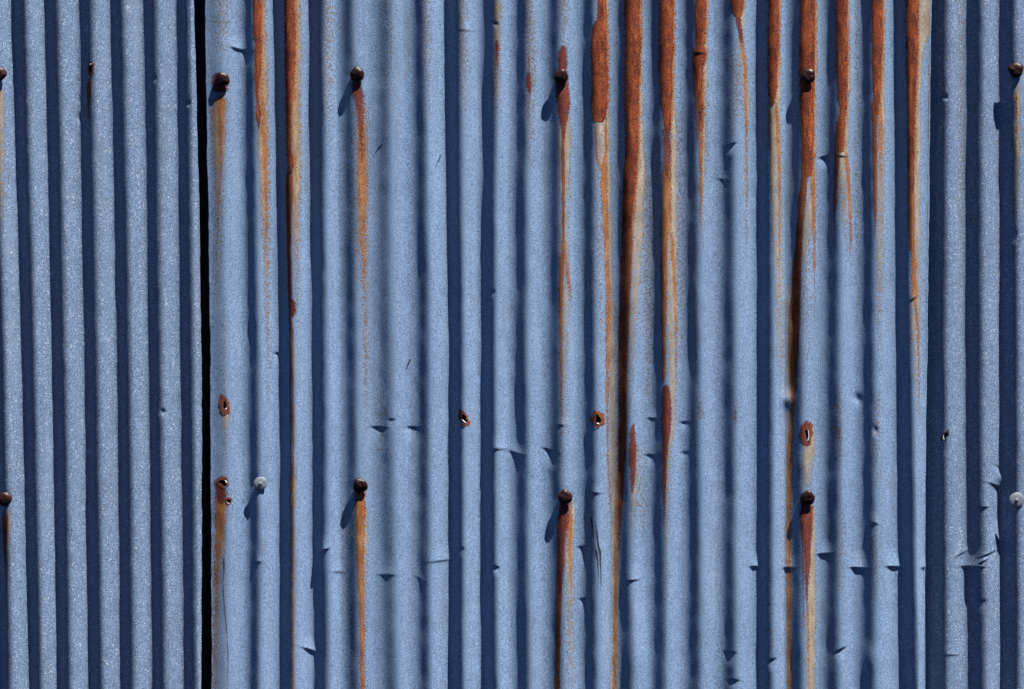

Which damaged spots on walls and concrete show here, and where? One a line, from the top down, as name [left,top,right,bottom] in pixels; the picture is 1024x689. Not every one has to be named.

rust [252,0,272,368]
rust [283,0,303,689]
rust [554,45,573,452]
rust [590,0,646,689]
rust [657,0,679,686]
rust [692,0,710,256]
rust [766,0,819,689]
rust [833,0,853,256]
rust [871,0,887,330]
rust [905,0,930,419]
rust [353,491,369,689]
rust [554,500,576,689]